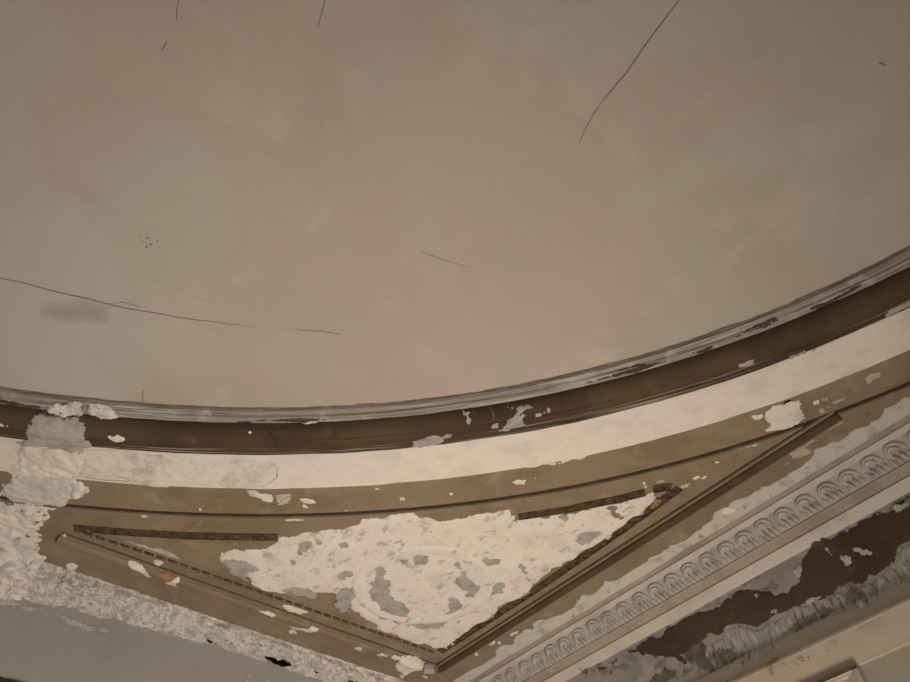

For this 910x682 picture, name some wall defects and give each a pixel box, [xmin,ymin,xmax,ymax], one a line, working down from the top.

crack [578,0,680,145]
crack [1,278,249,327]
flaking render [1,480,664,682]
peeling [631,496,910,658]